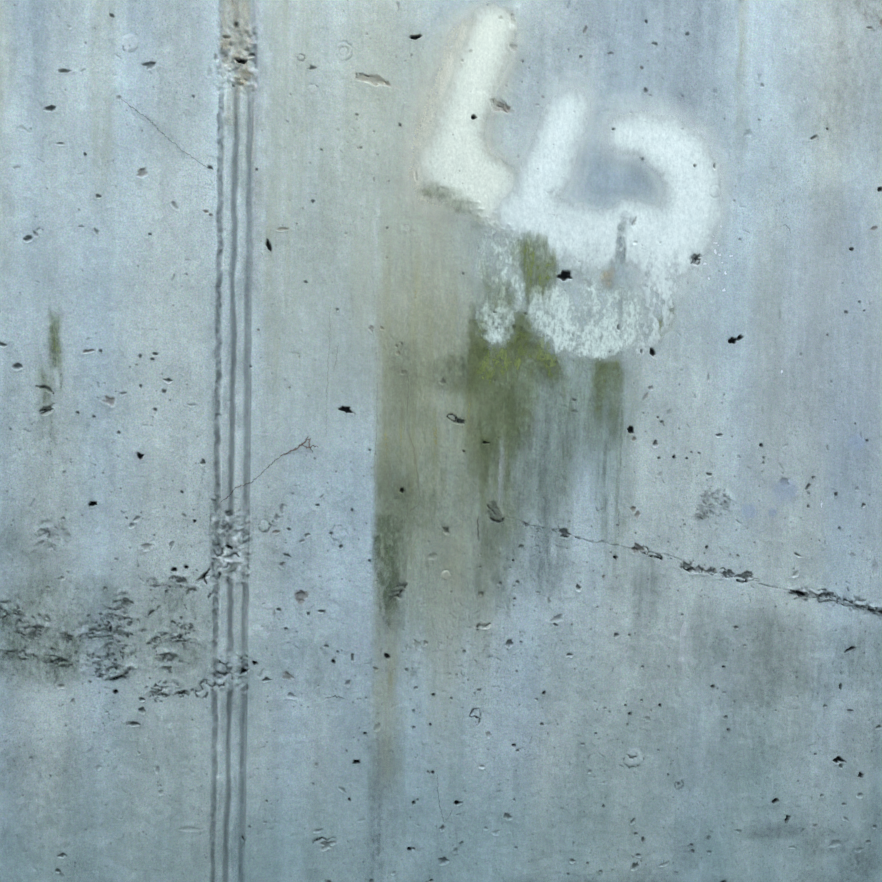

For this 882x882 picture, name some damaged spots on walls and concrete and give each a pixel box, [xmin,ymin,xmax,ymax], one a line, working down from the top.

spalling [218,15,256,106]
leakage [535,334,559,380]
leakage [596,351,620,411]
crack [477,501,882,620]
peeling [0,600,69,669]
spalling [60,593,196,683]
spalling [150,651,248,700]